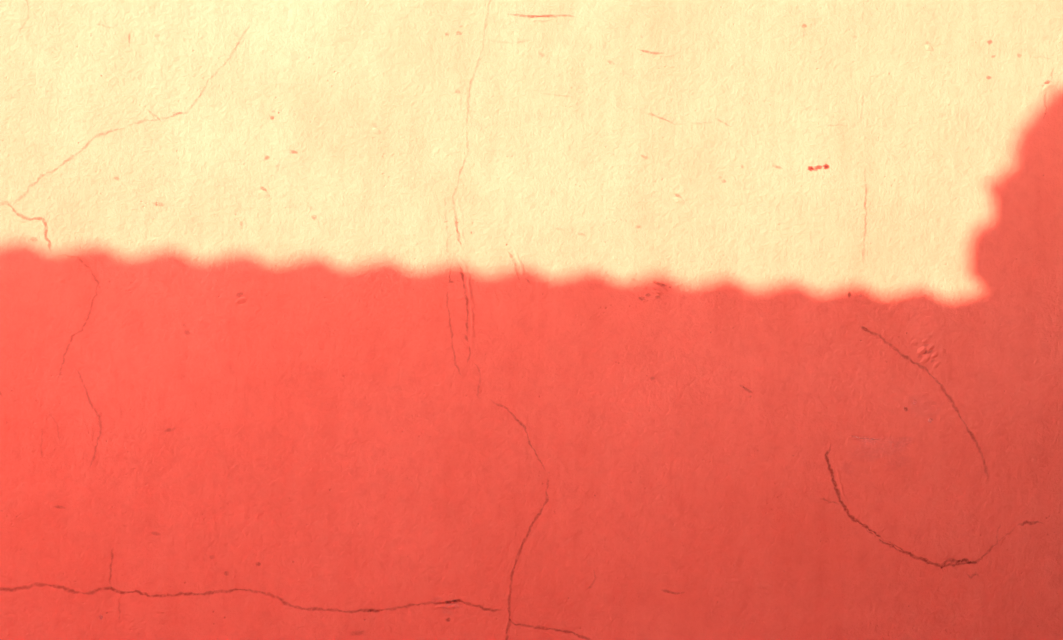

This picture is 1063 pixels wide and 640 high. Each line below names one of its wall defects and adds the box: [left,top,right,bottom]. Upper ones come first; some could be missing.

crack [827,460,911,557]